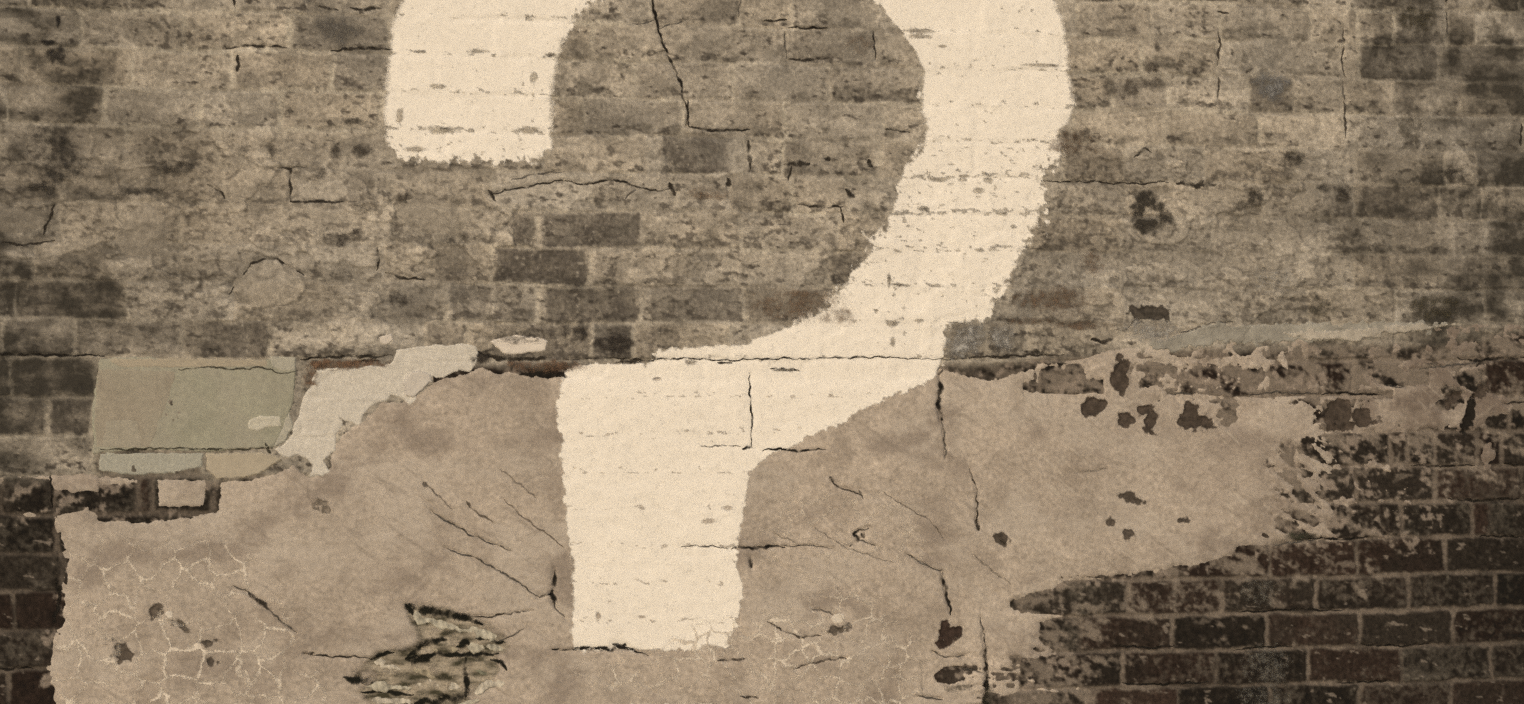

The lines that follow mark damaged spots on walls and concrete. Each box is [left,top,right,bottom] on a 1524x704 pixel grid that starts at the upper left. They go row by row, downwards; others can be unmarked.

crack [633,0,910,223]
crack [488,171,676,201]
crack [178,354,390,374]
peeling [248,334,548,477]
spalling [1081,353,1158,435]
spalling [1177,400,1217,432]
spalling [1324,398,1381,432]
spalling [1444,383,1487,435]
crack [423,317,1145,704]
spalling [1119,491,1146,505]
spalling [993,532,1011,547]
spalling [343,603,508,704]